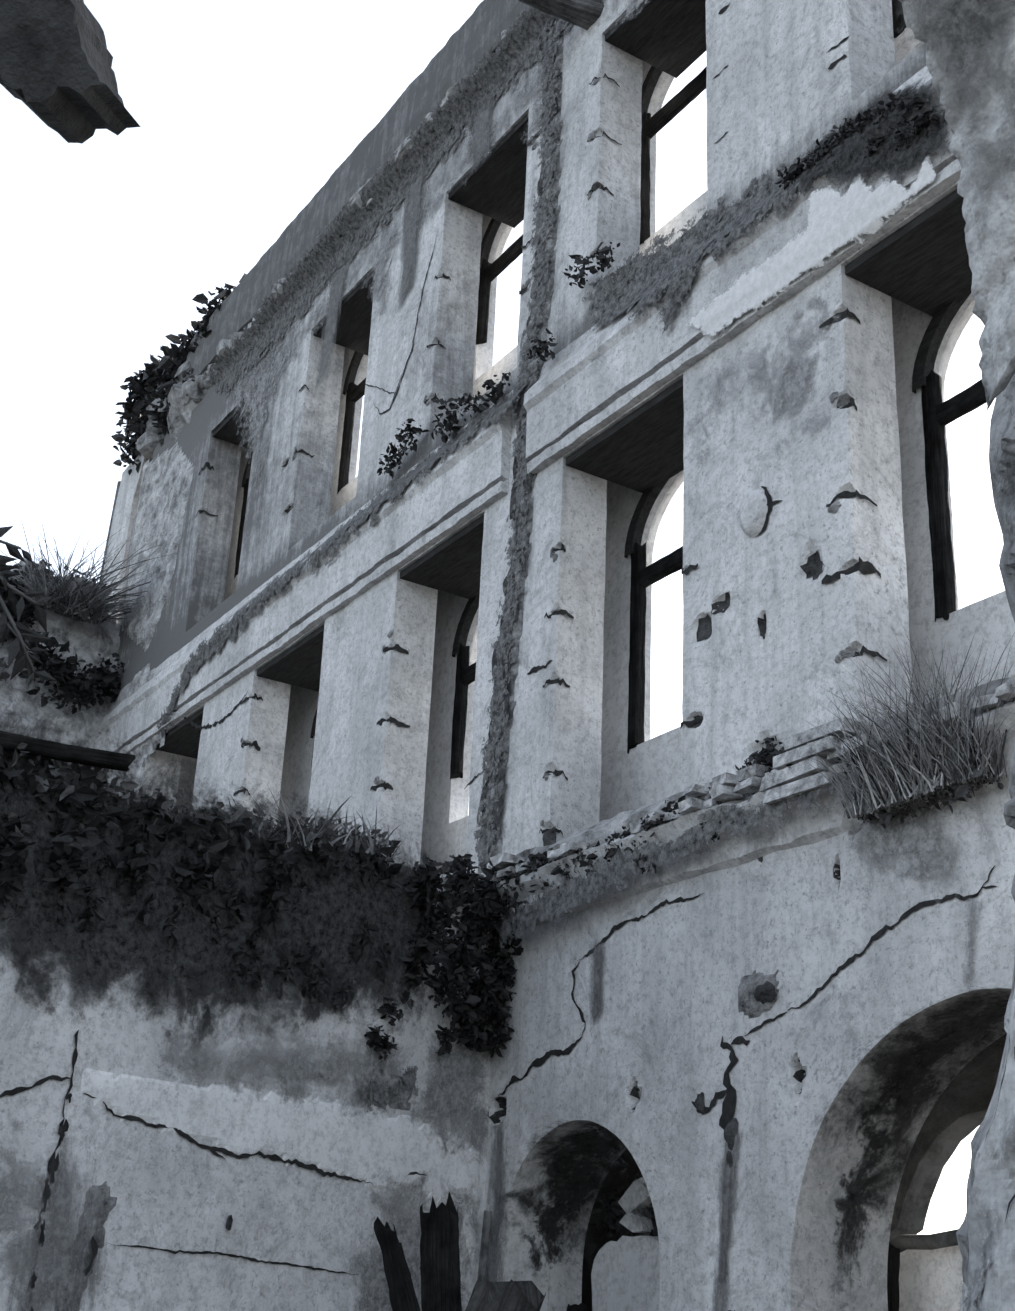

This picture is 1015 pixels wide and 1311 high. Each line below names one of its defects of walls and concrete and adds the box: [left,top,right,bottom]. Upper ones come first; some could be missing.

peeling [828,500,841,513]
peeling [834,647,860,663]
leakage [0,728,430,1115]
crack [498,893,703,1096]
spalling [738,969,779,1019]
crack [692,866,996,1168]
crack [0,1075,427,1184]
leakage [412,1044,628,1282]
leakage [825,975,1010,1291]
spalling [54,1181,117,1311]
crack [109,1243,359,1275]
leakage [353,1173,426,1311]